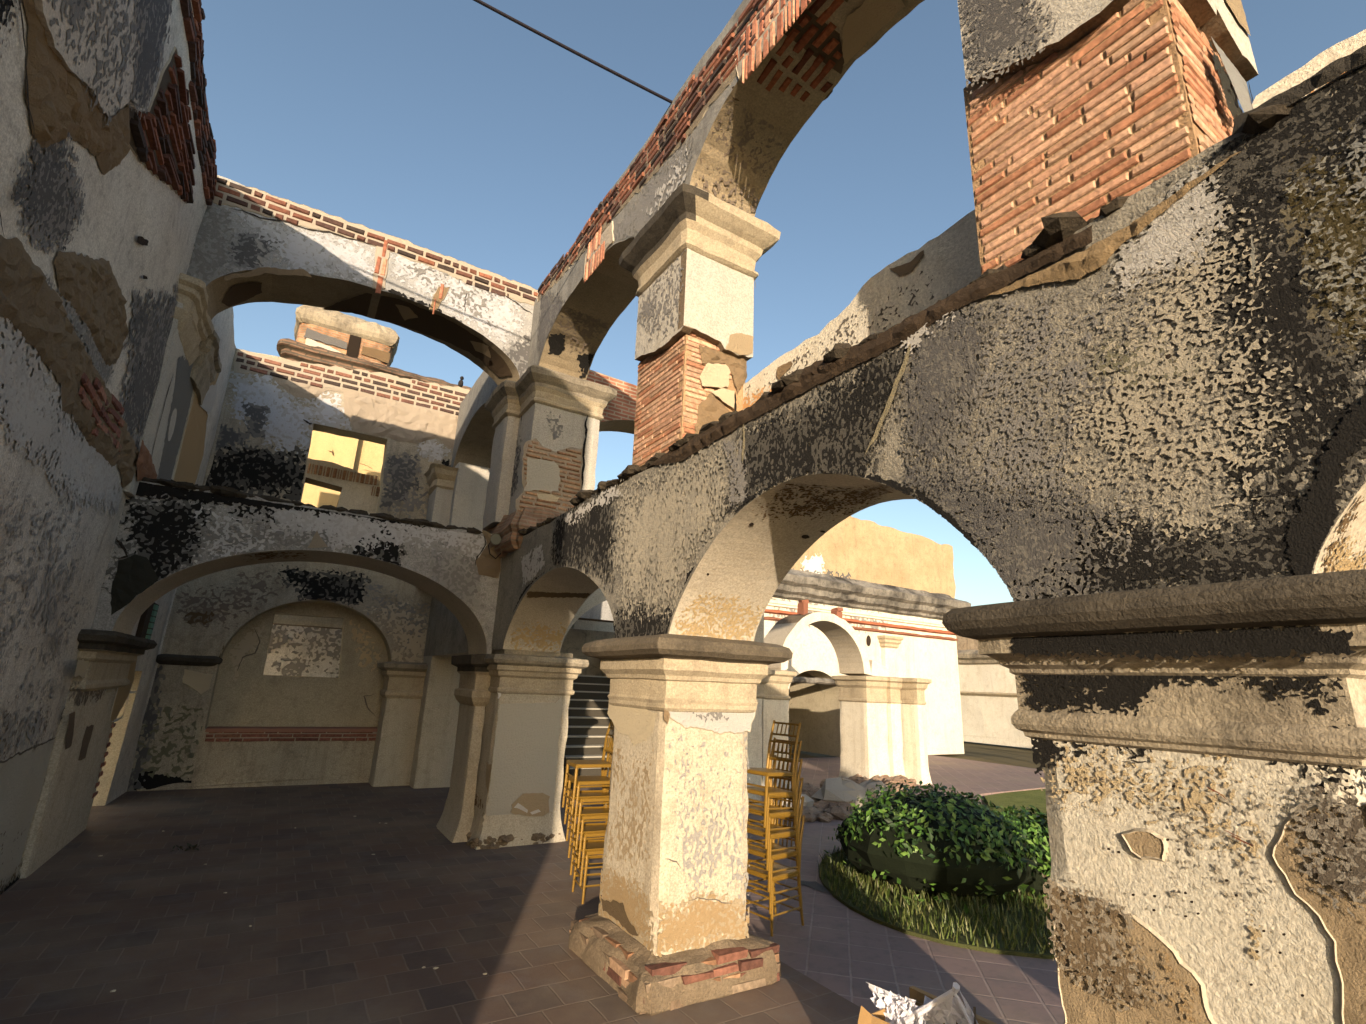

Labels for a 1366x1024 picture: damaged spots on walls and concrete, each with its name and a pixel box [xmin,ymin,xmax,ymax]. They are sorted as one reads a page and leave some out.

leakage [0,0,23,58]
leakage [47,0,173,126]
flaking render [128,46,196,204]
flaking render [213,0,848,377]
leakage [959,0,1058,94]
leakage [720,64,1366,601]
leakage [0,206,612,770]
spalling [515,438,583,514]
leakage [127,665,206,791]
spalling [1048,879,1217,1024]
spalling [1107,828,1180,862]
spalling [1270,804,1366,1024]